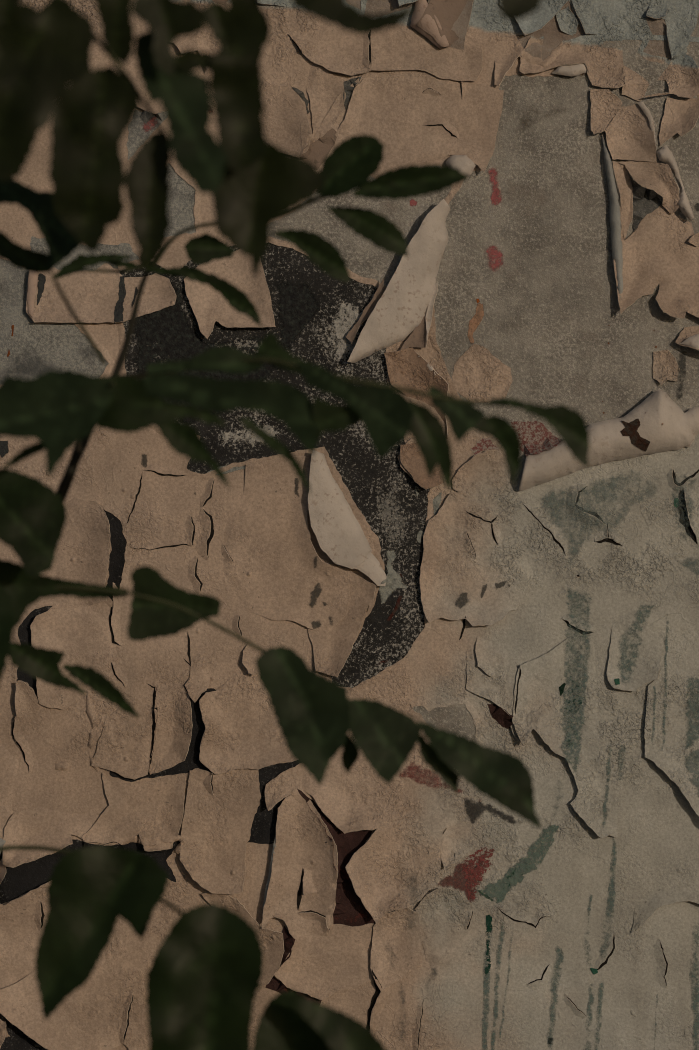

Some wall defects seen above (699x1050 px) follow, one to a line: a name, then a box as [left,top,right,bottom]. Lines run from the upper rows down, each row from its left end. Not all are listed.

peeling [0,0,699,839]
crack [127,454,233,593]
crack [232,615,242,636]
peeling [0,498,516,1050]
water stain [606,839,617,917]
water stain [482,915,510,1050]
water stain [548,948,563,1047]
water stain [585,936,608,1050]
water stain [689,930,699,1050]